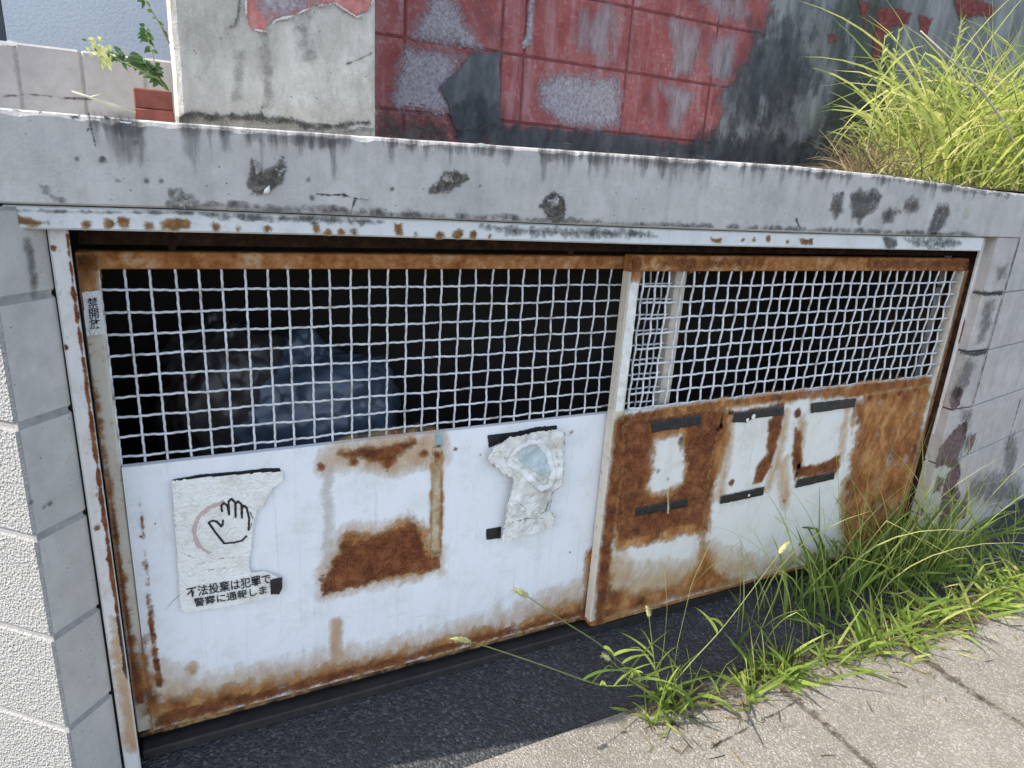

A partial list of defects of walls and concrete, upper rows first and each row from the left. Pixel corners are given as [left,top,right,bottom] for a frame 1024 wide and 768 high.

peeling [391,0,483,117]
water stain [690,13,865,177]
water stain [379,97,503,145]
rust [18,215,49,227]
rust [81,216,130,230]
rust [144,218,191,232]
spalling [247,156,287,196]
spalling [428,170,481,194]
spalling [539,192,566,223]
water stain [831,175,918,225]
mould [927,206,950,236]
rust [50,234,969,749]